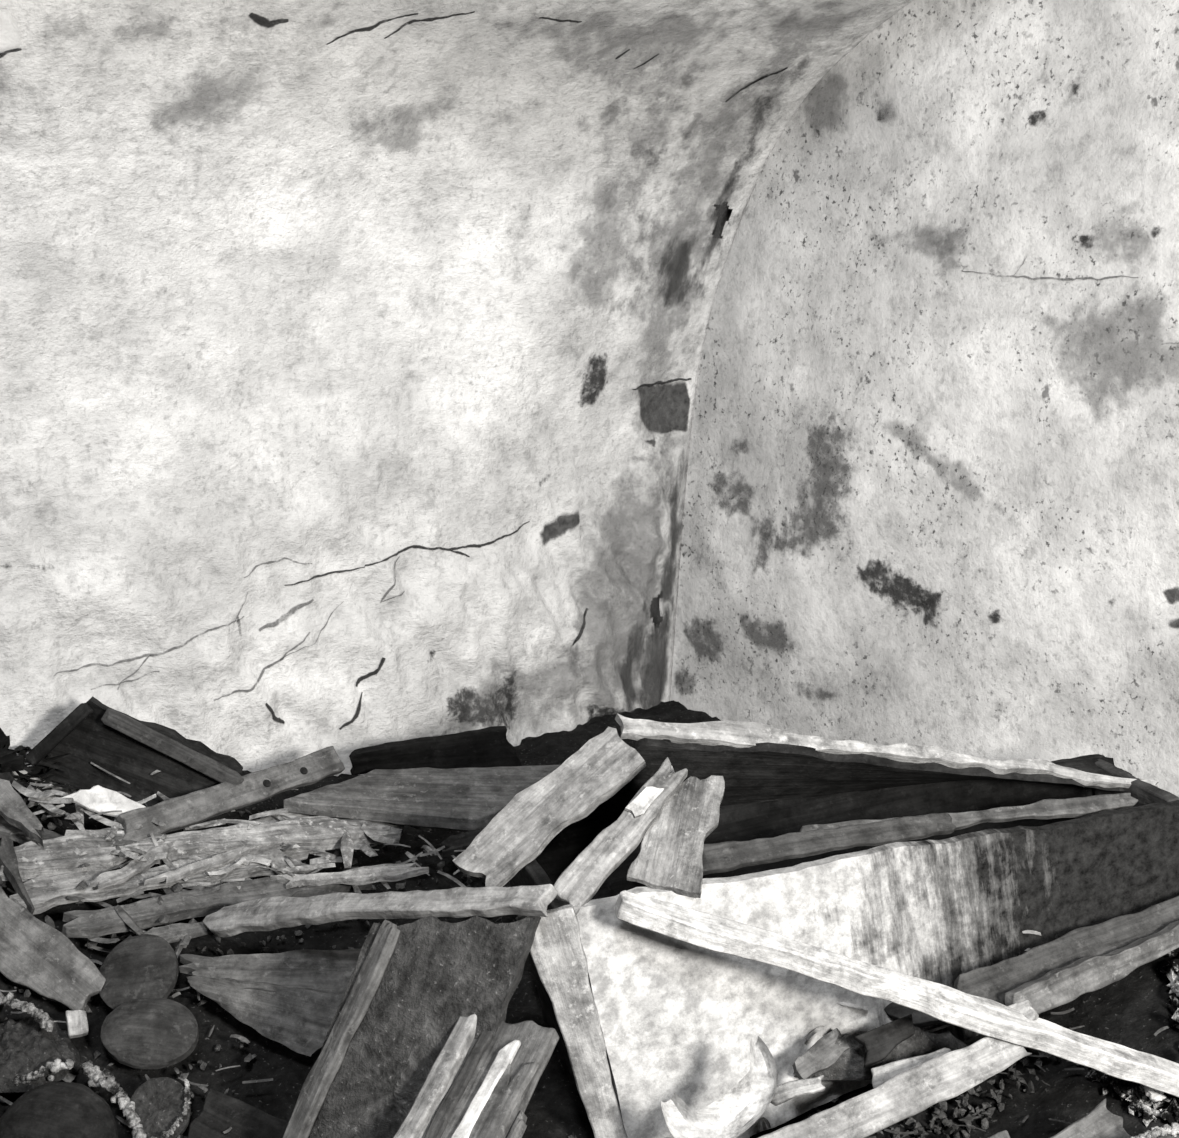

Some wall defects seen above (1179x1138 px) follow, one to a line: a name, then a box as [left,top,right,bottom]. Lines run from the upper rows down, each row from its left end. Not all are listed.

damp [661,97,773,305]
damp [578,356,607,407]
spalling [633,378,692,446]
spalling [541,513,580,545]
damp [754,417,850,571]
crack [214,612,333,724]
crack [56,521,530,690]
crack [339,657,386,730]
damp [448,671,517,728]
damp [588,470,694,722]
damp [741,616,793,652]
spalling [1164,588,1179,604]